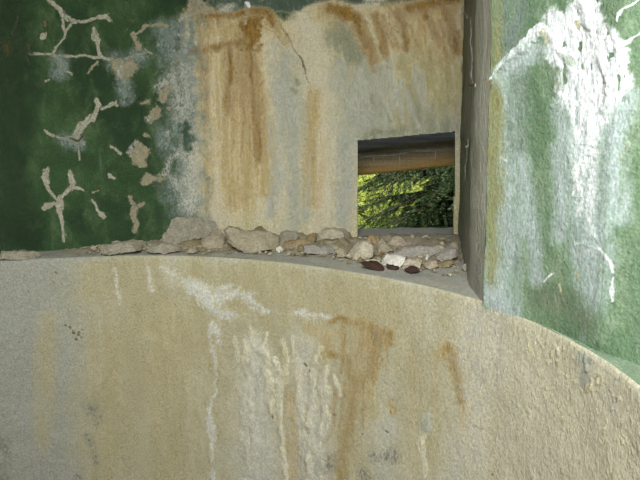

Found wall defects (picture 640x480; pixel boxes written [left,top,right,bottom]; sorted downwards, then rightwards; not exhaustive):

peeling [41,167,84,243]
peeling [27,0,169,161]
peeling [128,195,145,233]
peeling [110,133,166,186]
water stain [154,17,209,218]
corrosion [187,6,289,211]
crack [279,22,307,79]
corrosion [317,0,464,73]
water stain [445,0,640,480]
water stain [165,268,271,461]
corrosion [304,315,393,480]
corrosion [437,342,465,422]